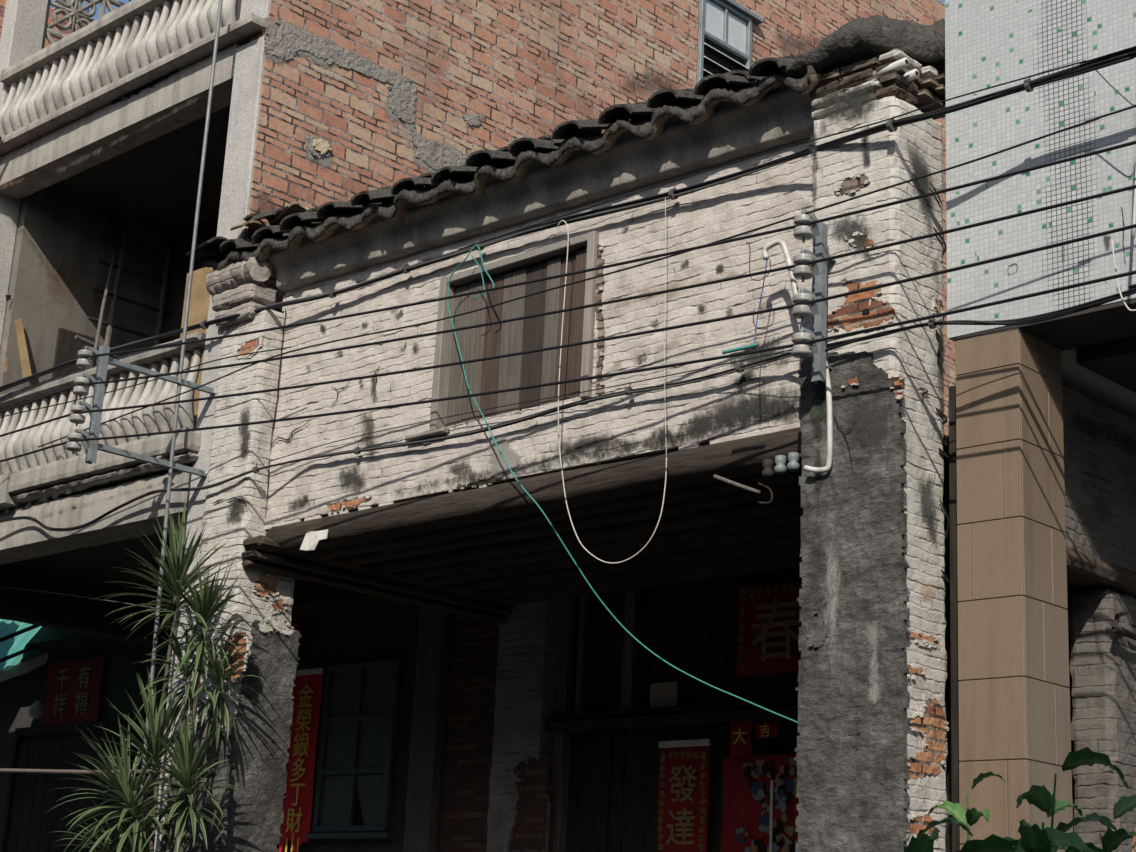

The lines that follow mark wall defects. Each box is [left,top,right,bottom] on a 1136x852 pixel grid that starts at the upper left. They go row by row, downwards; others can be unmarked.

spalling [833,173,870,196]
water stain [907,142,934,226]
spalling [843,231,875,248]
spalling [827,278,895,331]
water stain [416,338,826,504]
spalling [327,495,372,511]
water stain [919,477,939,556]
peeling [219,574,295,733]
spalling [907,662,926,680]
spalling [906,628,941,649]
peeling [907,693,949,780]
peeling [507,755,554,852]